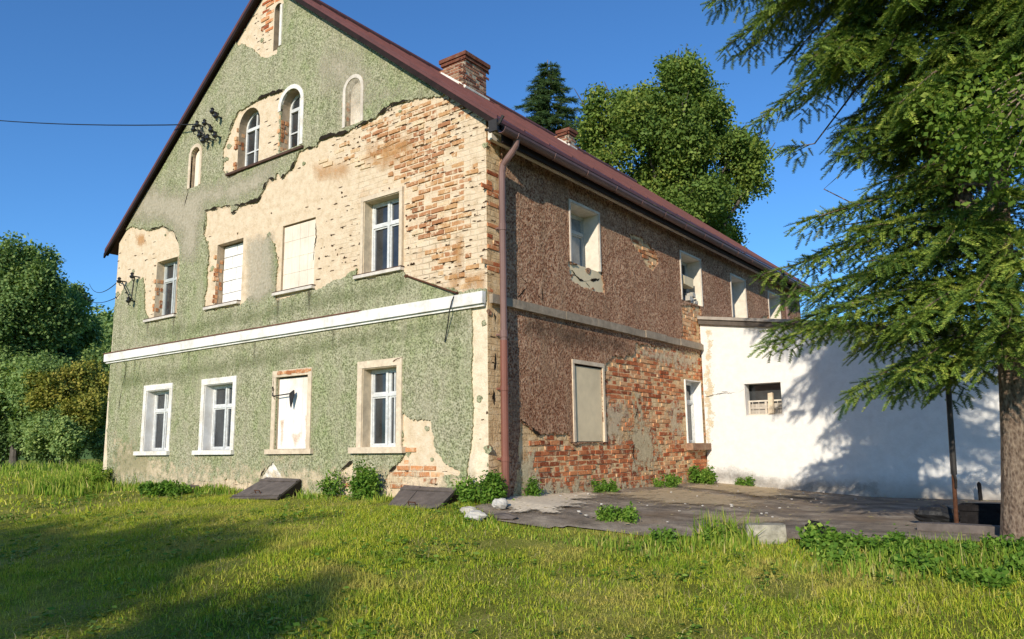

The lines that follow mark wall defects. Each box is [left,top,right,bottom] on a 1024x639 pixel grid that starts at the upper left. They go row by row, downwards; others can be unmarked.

flaking render [237,0,284,58]
peeling [115,226,180,322]
flaking render [204,90,501,497]
peeling [568,262,603,293]
flaking render [514,305,708,496]